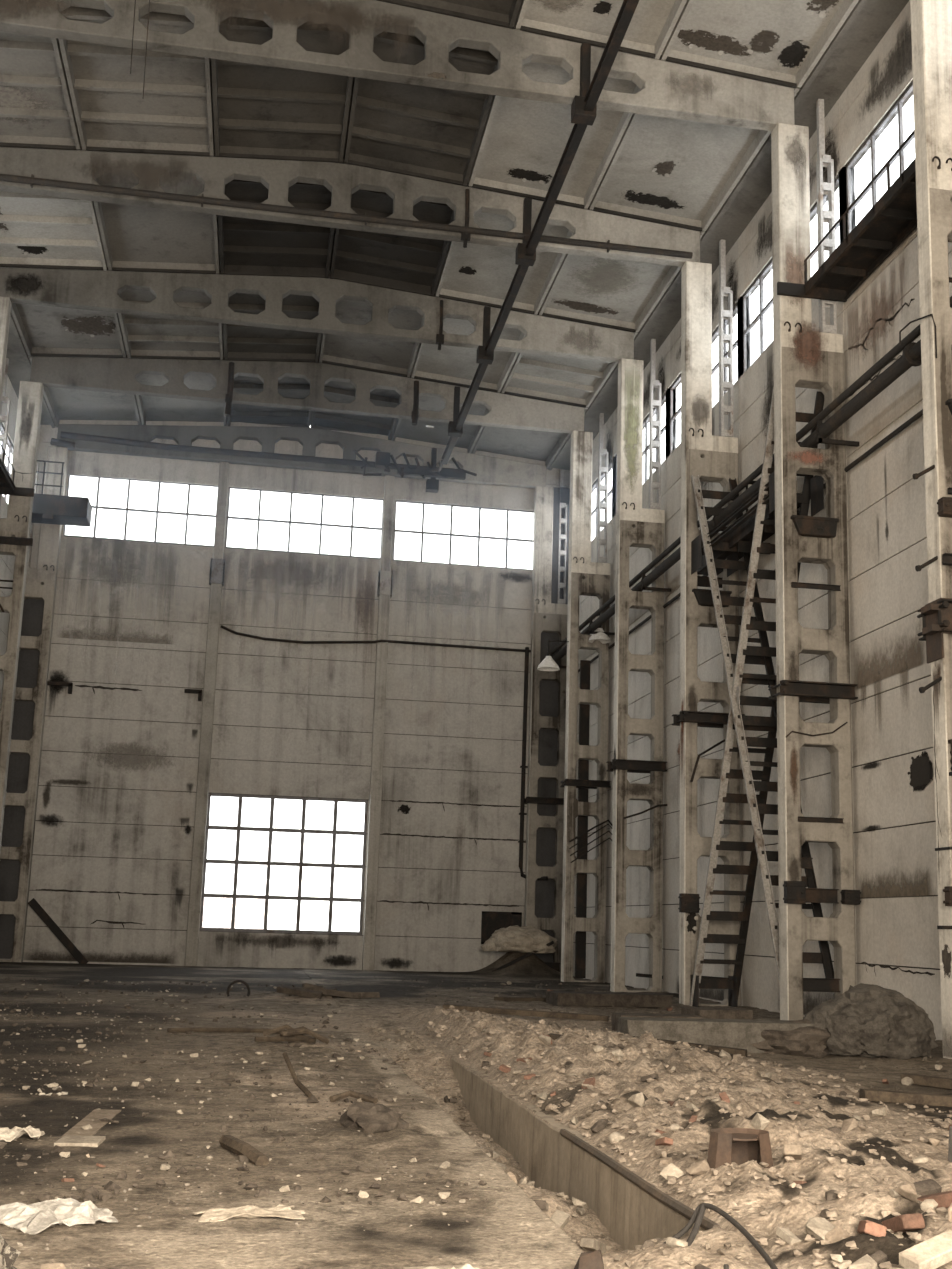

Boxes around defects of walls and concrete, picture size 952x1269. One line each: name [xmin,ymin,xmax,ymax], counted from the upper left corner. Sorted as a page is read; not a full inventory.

peeling [807,0,839,18]
peeling [676,29,810,68]
peeling [507,168,553,185]
peeling [652,160,679,178]
peeling [622,190,687,210]
peeling [61,316,116,337]